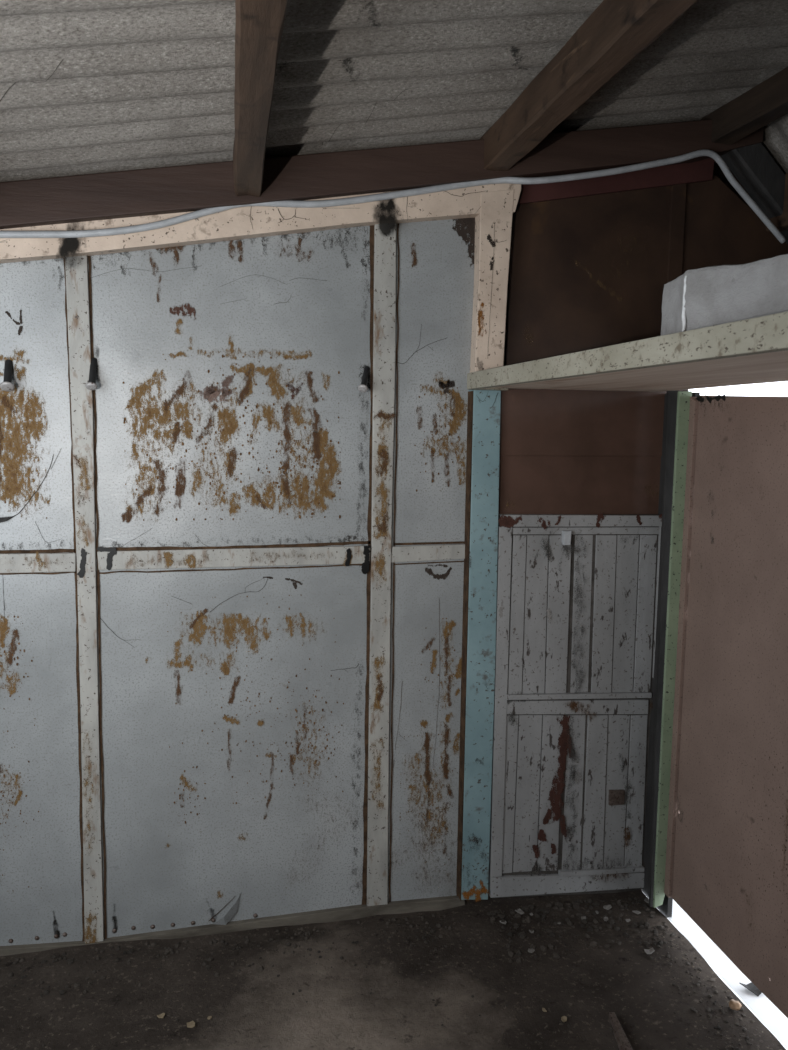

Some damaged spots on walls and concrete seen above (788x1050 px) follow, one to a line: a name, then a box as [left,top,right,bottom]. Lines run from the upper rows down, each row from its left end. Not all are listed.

corrosion [0,350,50,519]
corrosion [121,335,341,523]
corrosion [0,614,33,709]
corrosion [0,761,39,838]
corrosion [167,595,344,824]
corrosion [399,372,491,902]